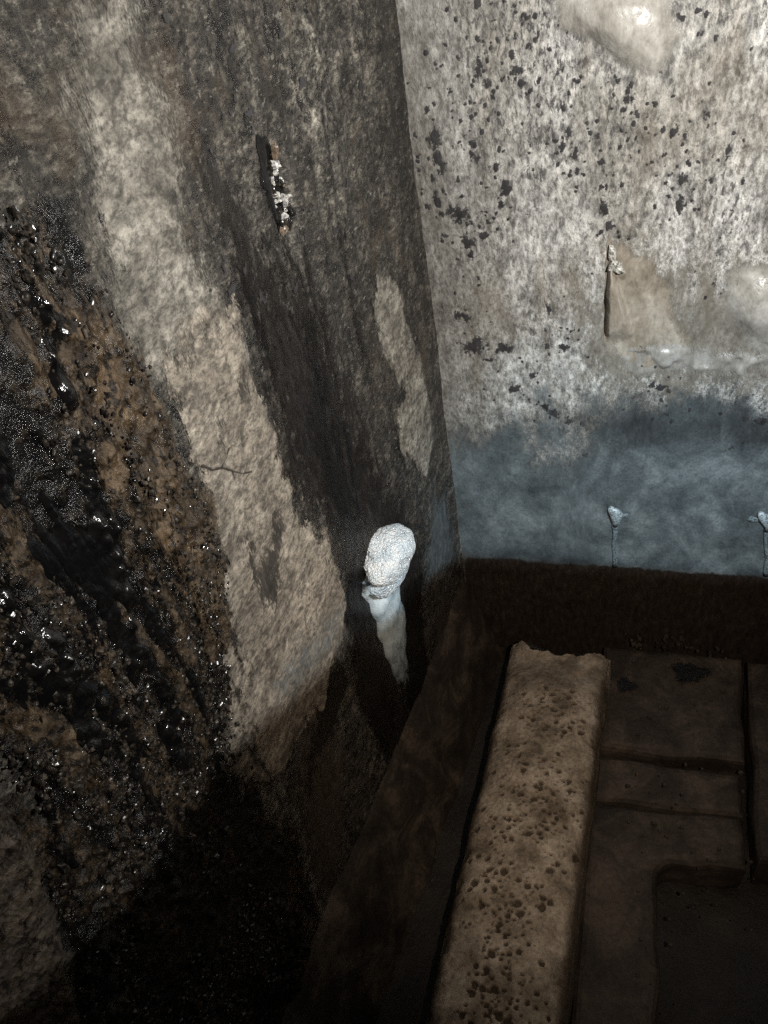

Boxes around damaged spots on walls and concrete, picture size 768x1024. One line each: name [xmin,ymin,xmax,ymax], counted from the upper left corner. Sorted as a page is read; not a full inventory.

damp [671,7,709,22]
damp [414,0,552,260]
damp [546,67,631,240]
damp [601,74,745,225]
peeling [56,0,347,802]
crack [202,447,252,478]
damp [449,309,768,579]
damp [222,218,450,931]
spalling [0,811,81,1024]